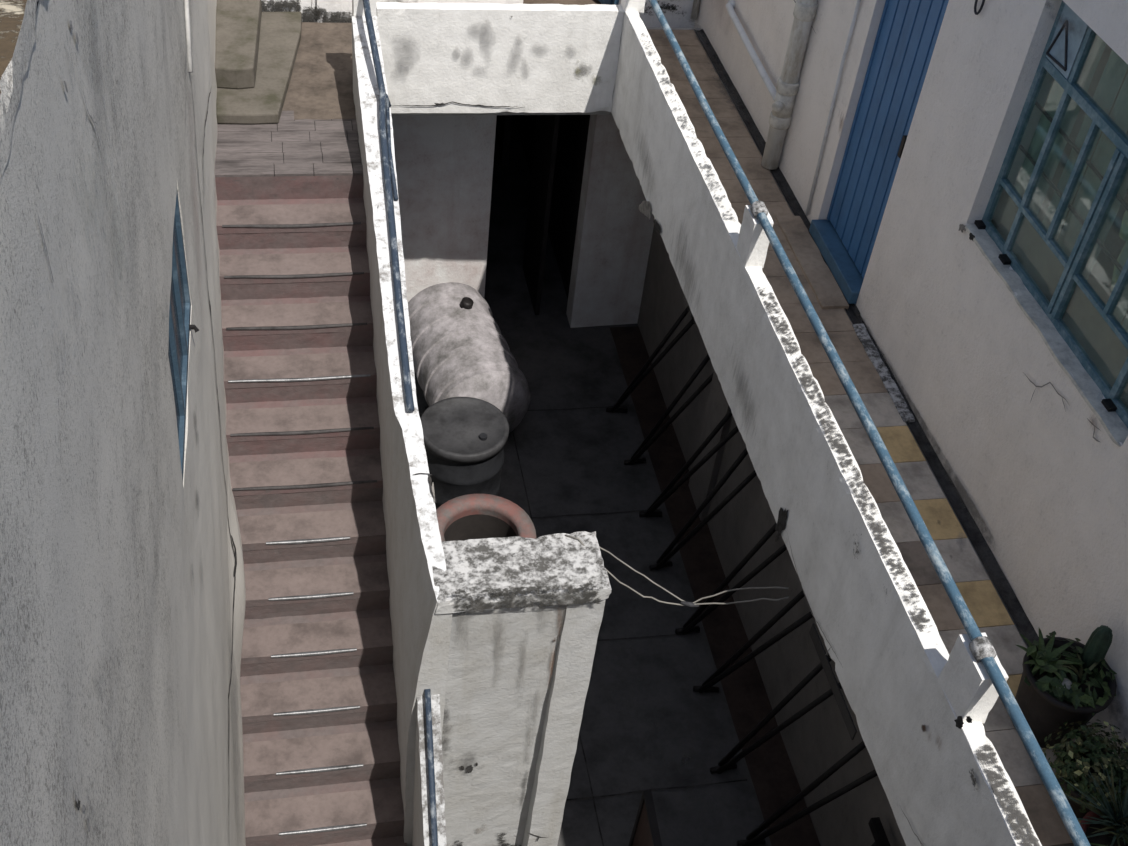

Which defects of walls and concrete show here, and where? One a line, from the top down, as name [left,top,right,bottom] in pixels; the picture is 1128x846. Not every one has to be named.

crack [394,100,523,108]
peeling [640,33,737,221]
crack [161,2,237,616]
peeling [757,286,930,631]
crack [1025,374,1101,442]
peeling [976,745,1040,846]